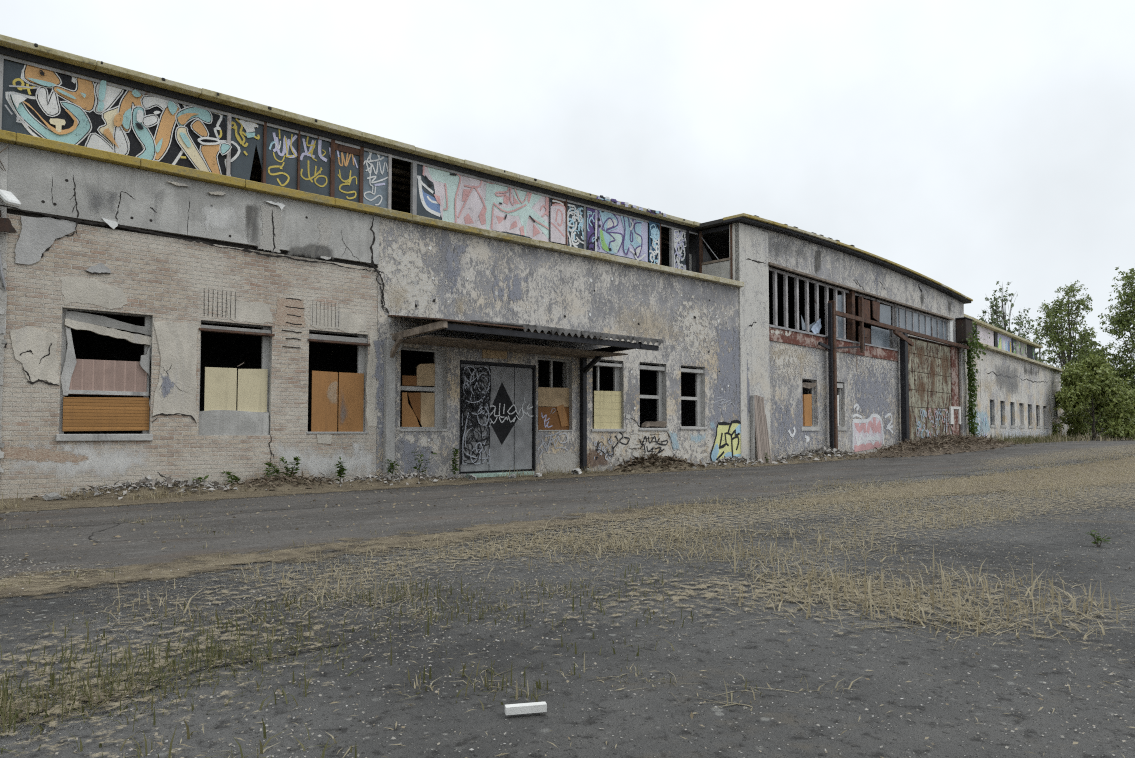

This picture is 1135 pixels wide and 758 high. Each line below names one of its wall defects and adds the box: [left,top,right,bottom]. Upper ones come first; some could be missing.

spalling [0,232,88,476]
crack [1,174,389,313]